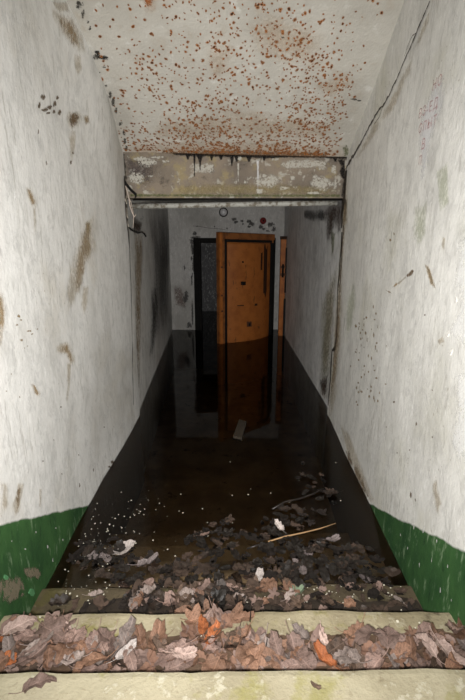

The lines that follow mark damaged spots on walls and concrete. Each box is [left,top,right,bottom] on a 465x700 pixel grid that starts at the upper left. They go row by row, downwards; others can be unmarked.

rust [113,0,366,157]
leakage [77,224,91,283]
leakage [134,218,142,366]
leakage [151,226,169,348]
leakage [129,153,347,252]
peeling [244,158,345,197]
leakage [320,285,340,395]
peeling [0,567,41,602]